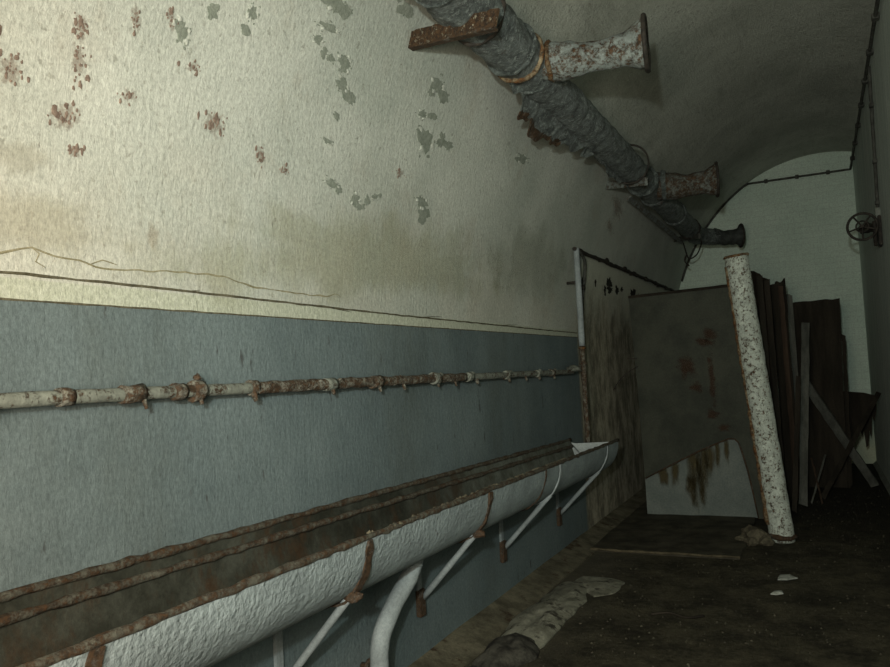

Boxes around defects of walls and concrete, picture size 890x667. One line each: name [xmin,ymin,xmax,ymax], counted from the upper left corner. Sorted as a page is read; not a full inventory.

peeling [207,3,220,20]
peeling [241,2,261,36]
rust [0,49,30,86]
rust [47,12,92,125]
peeling [311,0,356,106]
peeling [427,73,450,104]
rust [68,143,86,157]
rust [197,109,228,137]
peeling [415,109,453,158]
peeling [322,174,382,210]
peeling [413,194,430,225]
crack [0,246,577,338]